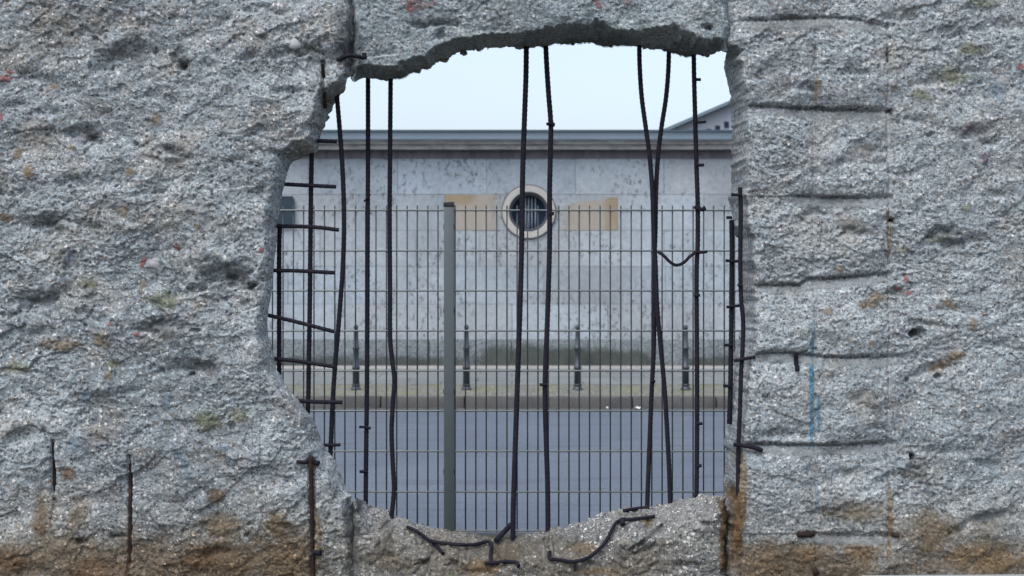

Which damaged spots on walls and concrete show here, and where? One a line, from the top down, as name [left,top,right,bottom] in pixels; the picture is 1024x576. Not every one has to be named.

spalling [336,43,367,62]
corrosion [61,468,74,480]
corrosion [0,489,327,576]
spalling [268,92,347,576]
spalling [359,78,371,504]
spalling [387,78,397,519]
spalling [406,46,529,568]
spalling [540,46,555,533]
spalling [547,45,673,571]
spalling [691,54,708,498]
spalling [723,187,763,497]
corrosion [716,447,1024,576]